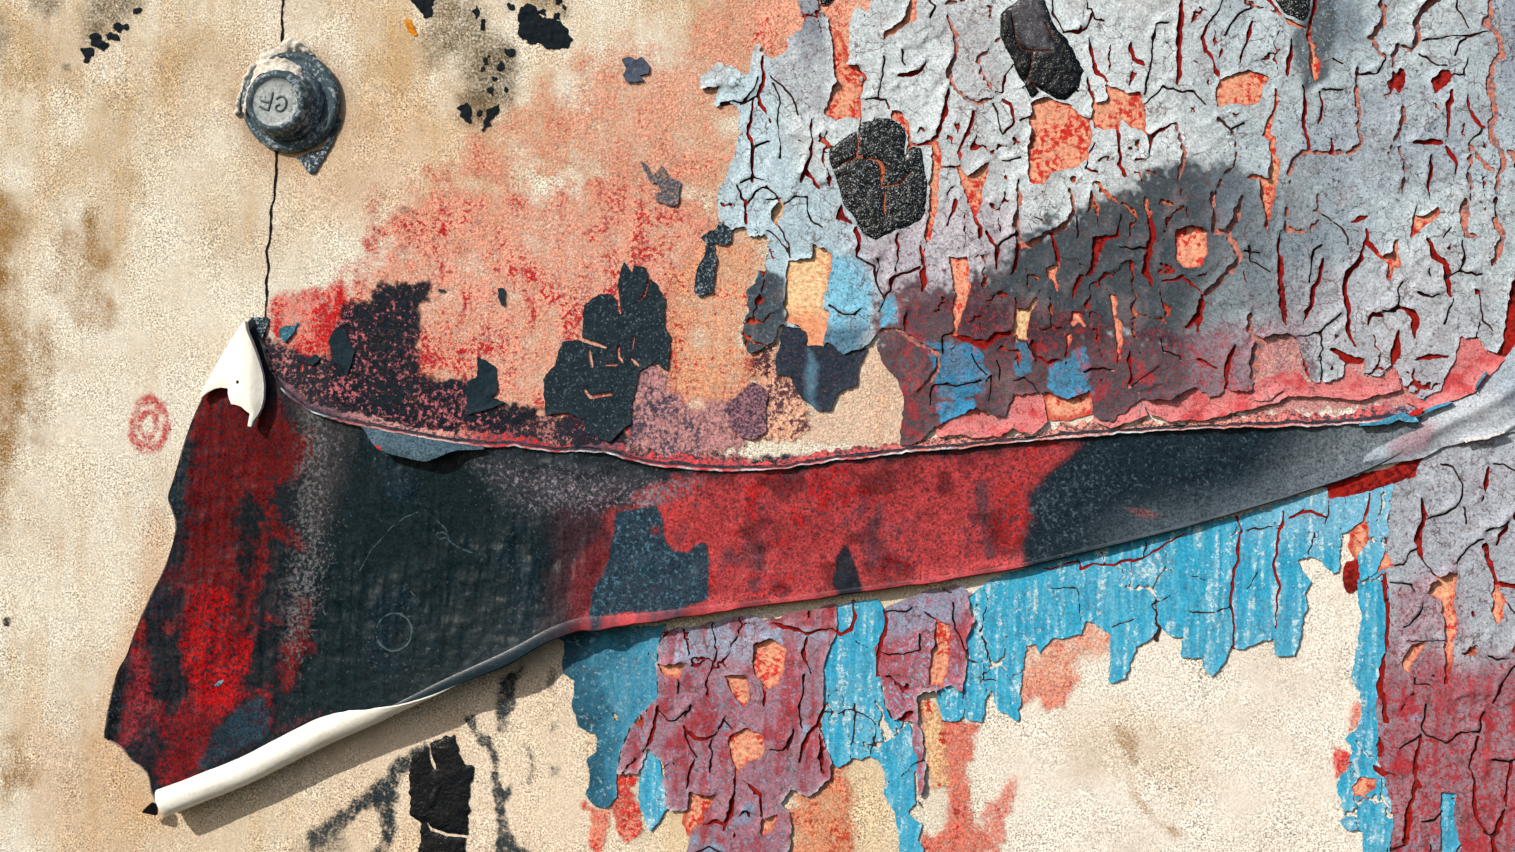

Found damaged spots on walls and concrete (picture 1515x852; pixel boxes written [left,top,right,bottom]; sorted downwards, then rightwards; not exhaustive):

crack [746,54,772,183]
crack [865,0,1015,146]
crack [1088,0,1207,105]
crack [1239,0,1441,184]
crack [1413,0,1507,200]
crack [264,151,278,333]
peeling [543,262,671,442]
crack [985,184,1077,275]
peeling [694,0,1515,447]
crack [1303,215,1452,367]
peeling [104,317,1515,852]
crack [772,600,889,677]